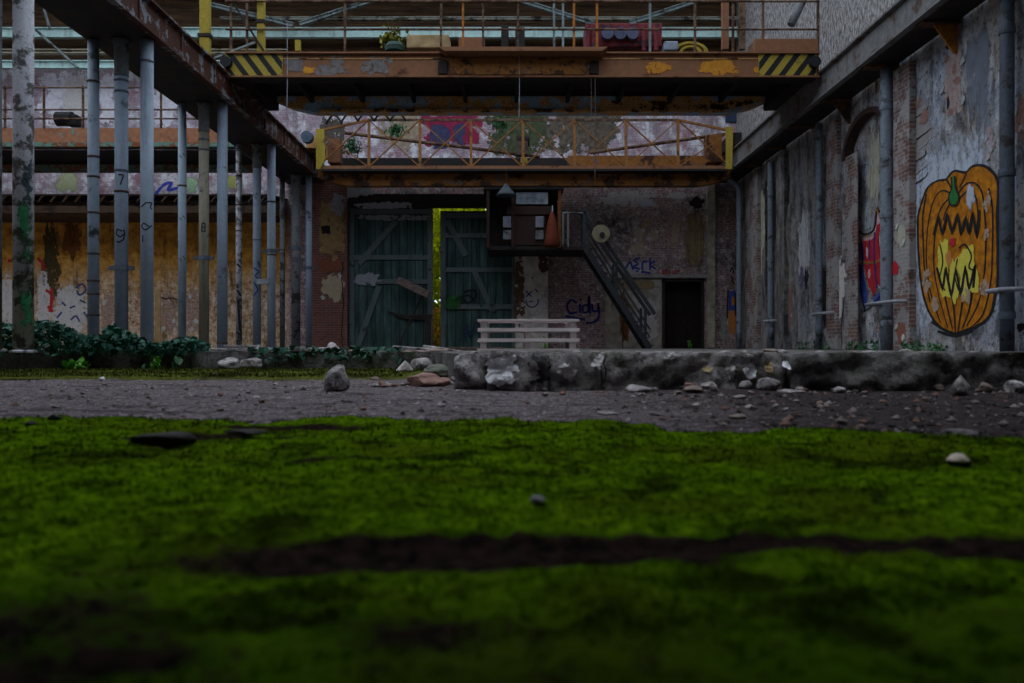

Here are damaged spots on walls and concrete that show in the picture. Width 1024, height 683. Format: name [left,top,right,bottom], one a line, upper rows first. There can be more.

corrosion [642,61,672,74]
corrosion [699,59,740,75]
damp [41,222,62,299]
peeling [319,187,430,303]
peeling [839,255,847,320]
peeling [895,221,906,250]